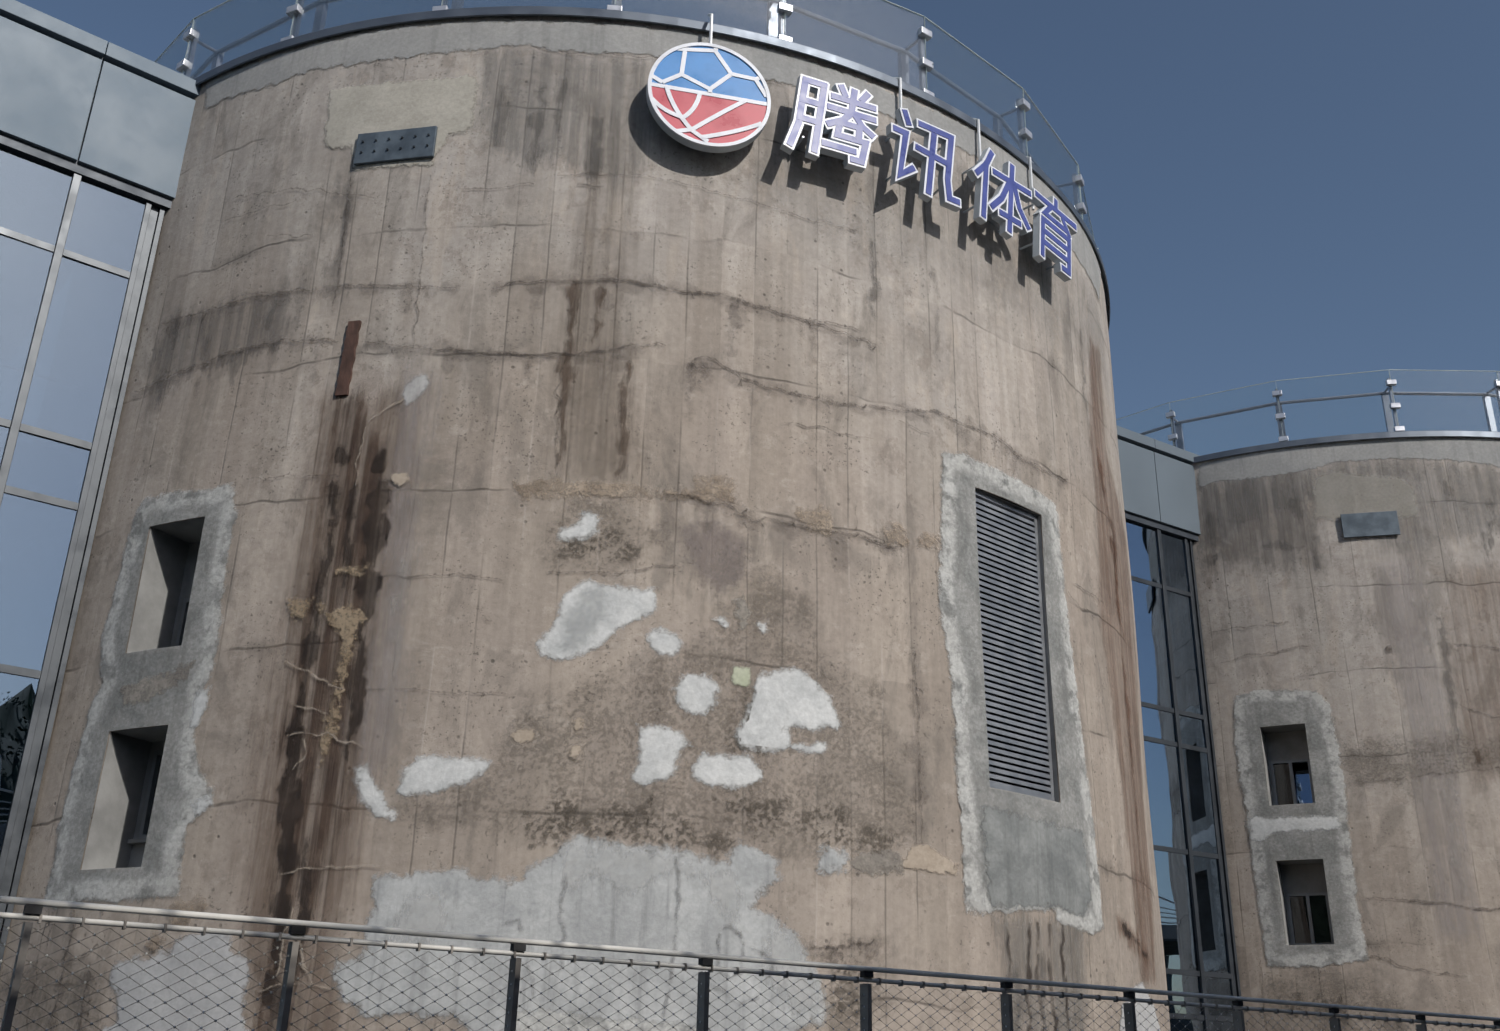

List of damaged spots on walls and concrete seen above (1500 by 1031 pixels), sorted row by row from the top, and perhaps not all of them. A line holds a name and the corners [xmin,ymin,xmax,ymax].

crack [506,278,876,349]
corrosion [335,320,362,397]
damp [557,284,578,427]
damp [619,401,628,471]
peeling [767,931,816,1013]
damp [1007,922,1070,1031]